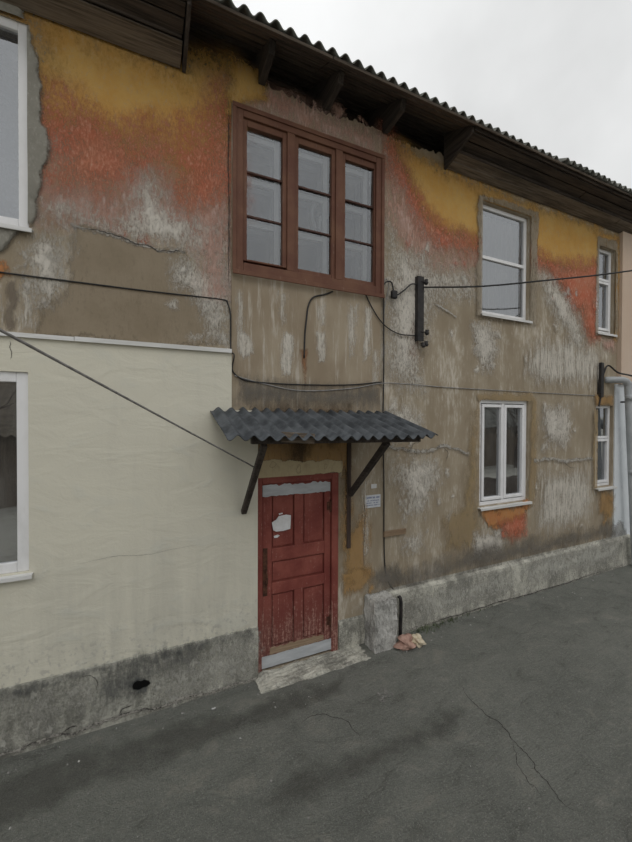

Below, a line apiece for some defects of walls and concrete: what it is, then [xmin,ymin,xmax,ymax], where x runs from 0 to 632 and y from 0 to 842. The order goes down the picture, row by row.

peeling [1,10,380,175]
crack [71,222,185,254]
peeling [381,139,620,392]
damp [235,294,254,358]
damp [240,304,379,405]
peeling [258,443,352,478]
peeling [389,400,423,425]
peeling [392,455,449,520]
damp [376,426,614,590]
peeling [473,392,627,554]
crack [463,688,574,811]